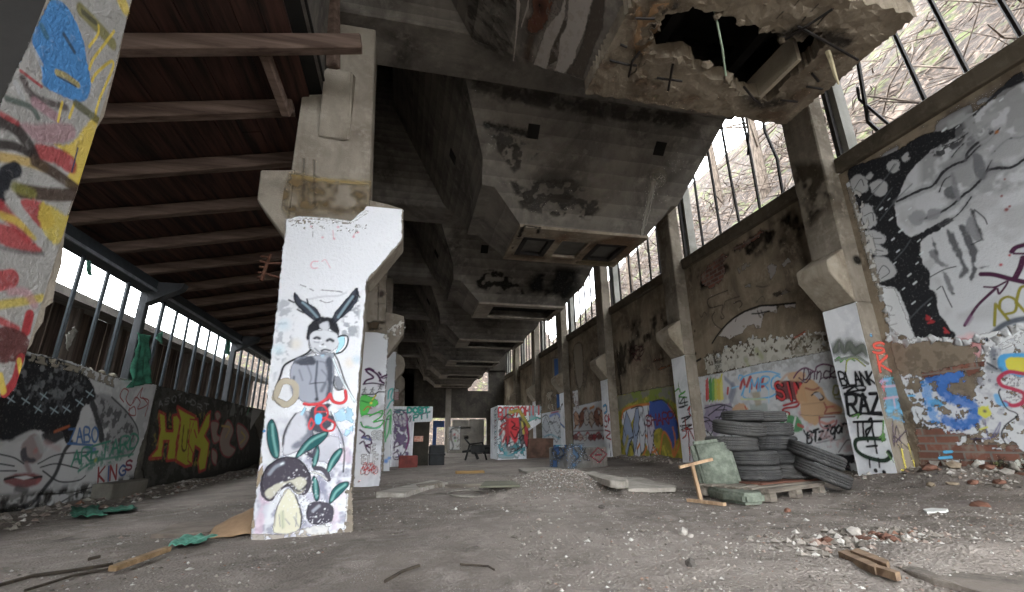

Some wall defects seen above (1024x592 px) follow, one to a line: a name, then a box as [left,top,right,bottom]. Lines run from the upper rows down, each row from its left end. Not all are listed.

spalling [593,1,683,103]
spalling [758,8,859,61]
leakage [476,81,690,128]
spalling [723,66,823,120]
leakage [484,122,599,218]
leakage [476,270,524,294]
peeling [704,304,831,374]
peeling [847,186,1024,476]